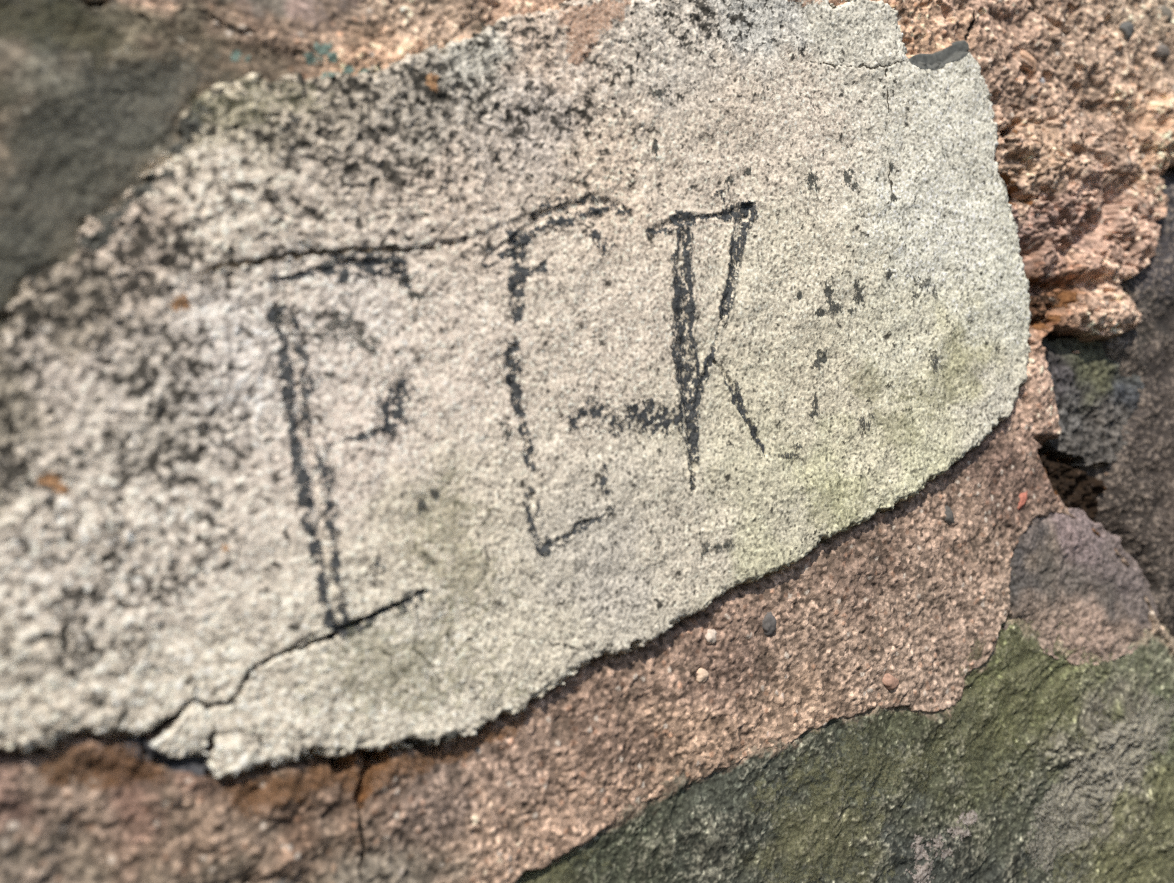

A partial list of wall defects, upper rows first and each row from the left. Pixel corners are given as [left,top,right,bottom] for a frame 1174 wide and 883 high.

crack [79,0,175,45]
crack [189,9,260,36]
crack [138,592,438,753]
crack [353,758,373,878]